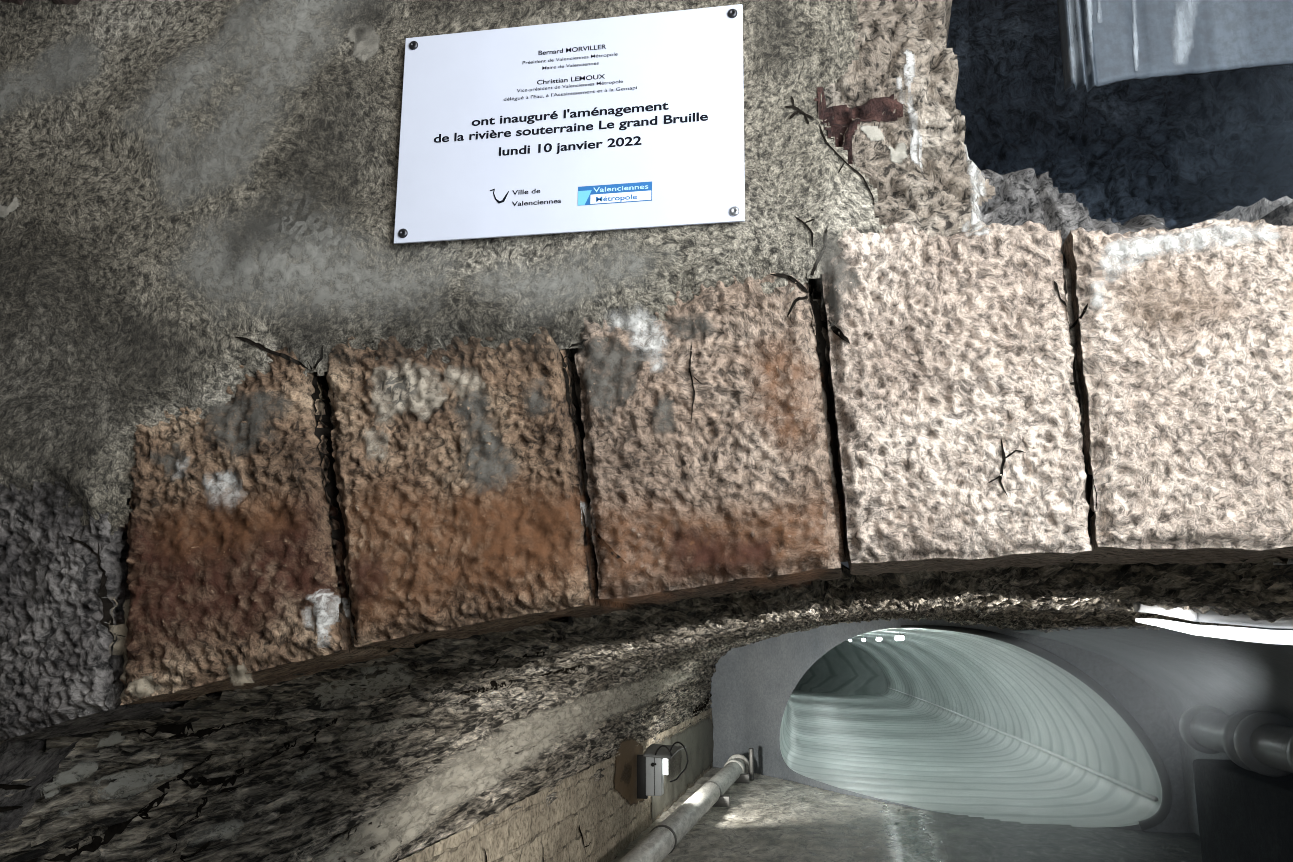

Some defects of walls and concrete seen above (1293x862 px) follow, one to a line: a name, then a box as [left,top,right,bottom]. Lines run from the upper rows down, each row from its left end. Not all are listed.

crack [785,96,874,202]
crack [770,216,850,561]
crack [988,439,1026,497]
crack [68,536,126,657]